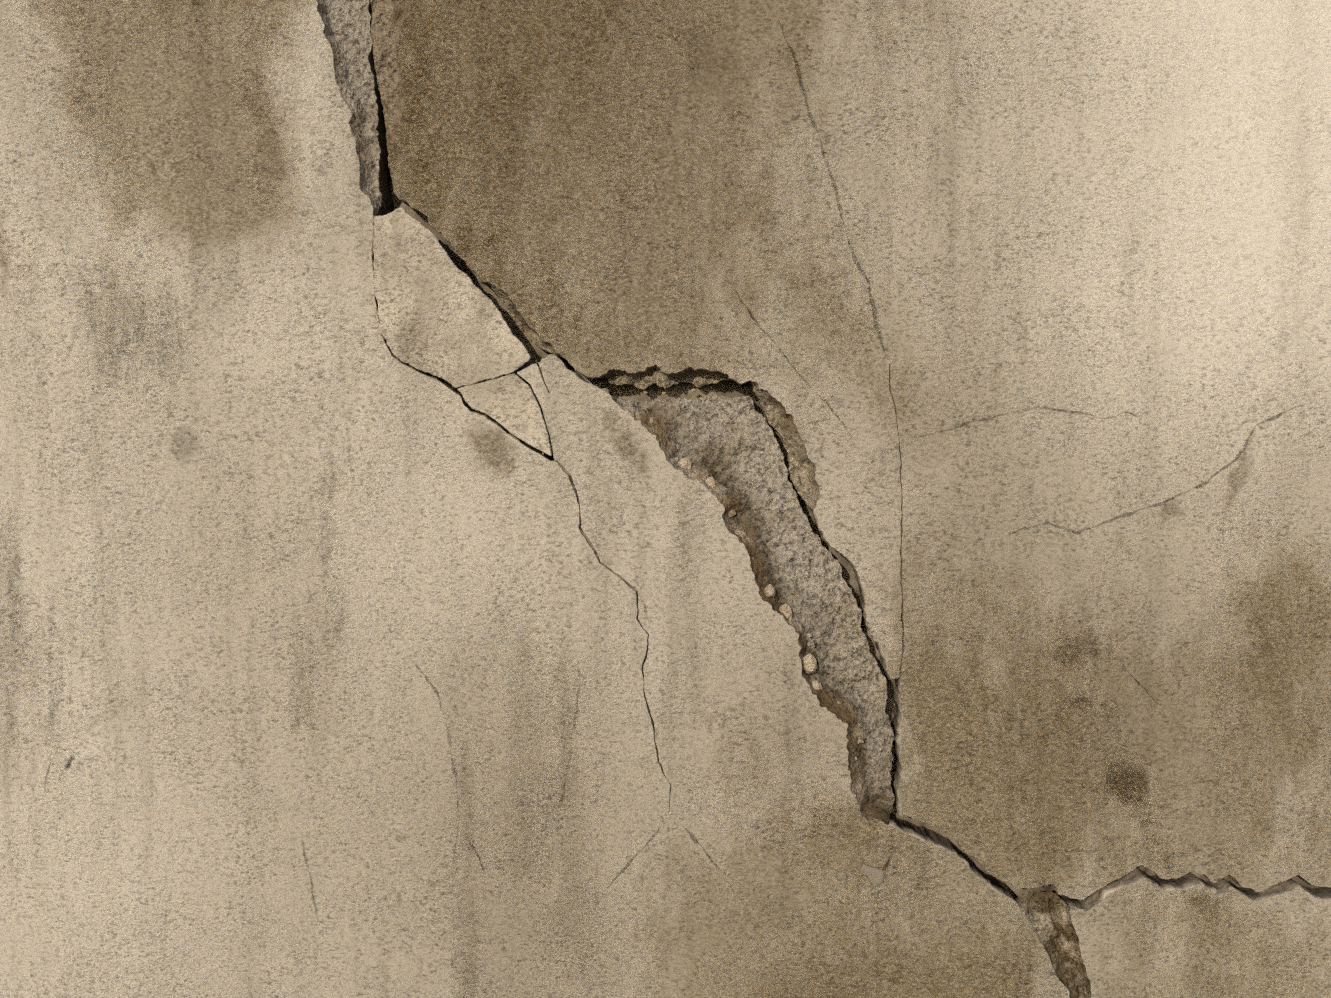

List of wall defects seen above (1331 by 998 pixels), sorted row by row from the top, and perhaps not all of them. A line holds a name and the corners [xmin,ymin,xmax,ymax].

spalling [316,0,412,216]
spalling [611,381,895,825]
crack [371,178,1331,911]